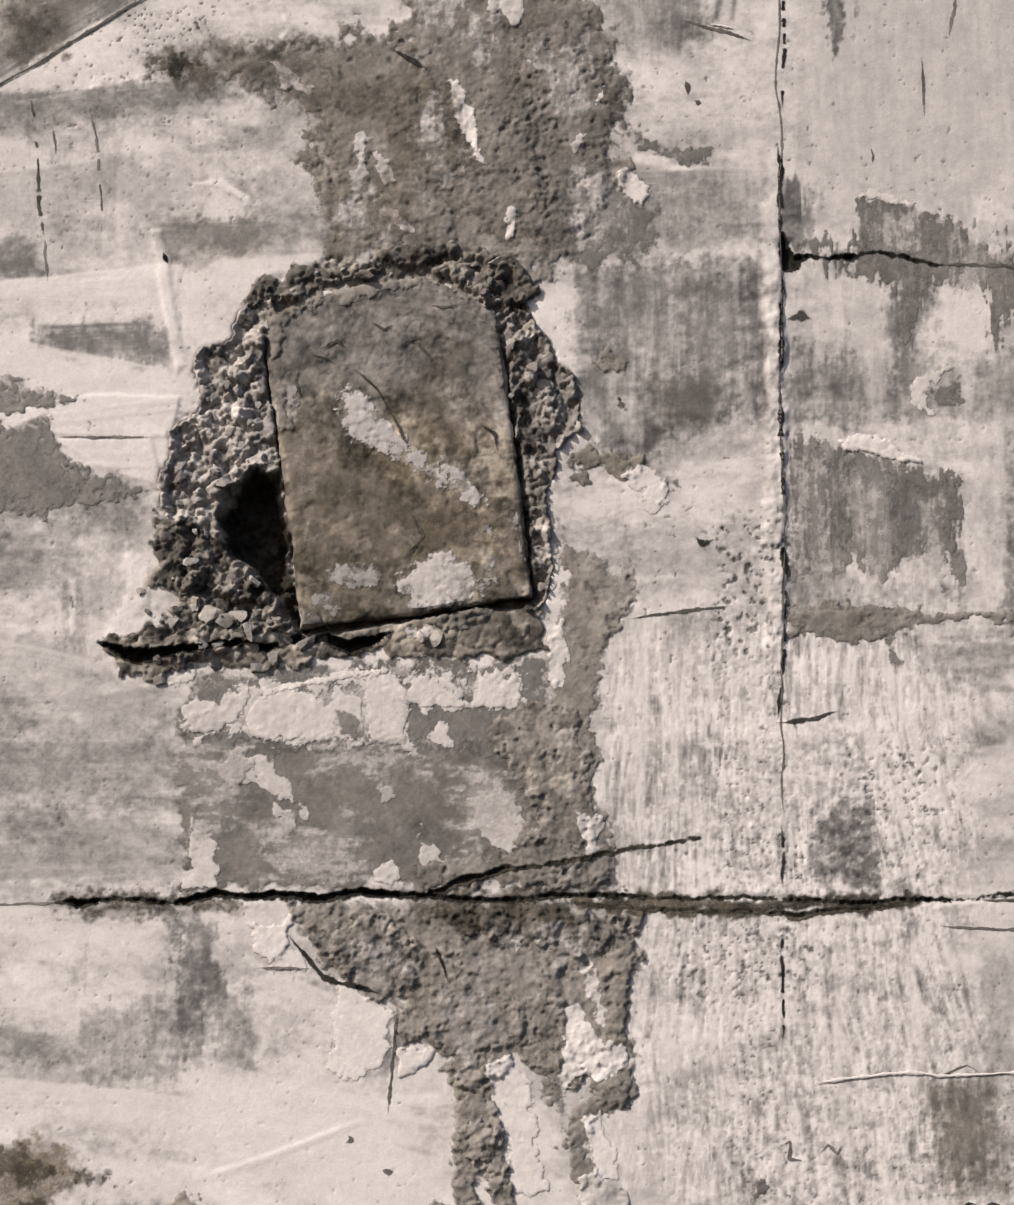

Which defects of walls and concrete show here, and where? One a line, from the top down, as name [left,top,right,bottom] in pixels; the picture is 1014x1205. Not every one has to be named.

crack [0,0,142,85]
crack [684,20,748,40]
crack [31,101,56,276]
crack [62,433,143,441]
peeling [0,0,713,892]
crack [774,0,1014,806]
rust [288,431,524,617]
crack [696,537,712,547]
crack [637,606,726,618]
crack [0,828,1014,1038]
crack [387,1014,397,1105]
spalling [167,1191,201,1205]